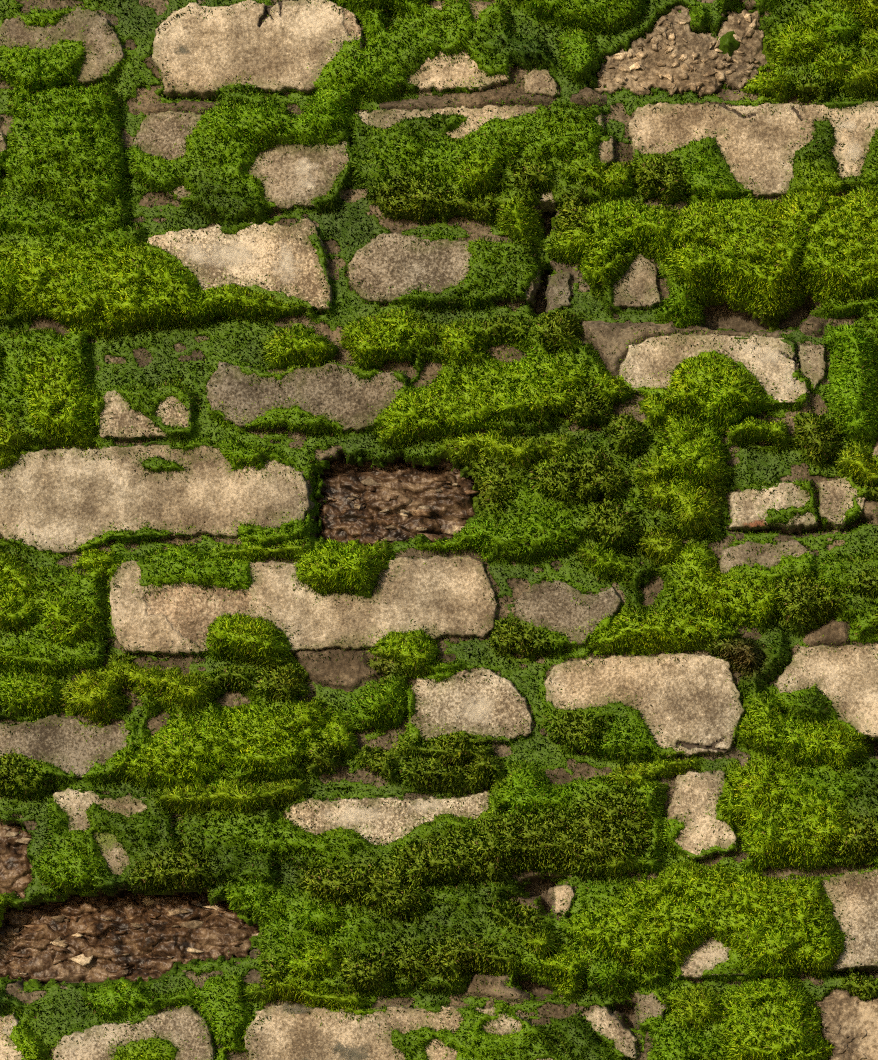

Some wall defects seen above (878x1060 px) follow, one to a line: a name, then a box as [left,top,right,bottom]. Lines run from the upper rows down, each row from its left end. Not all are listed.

crack [258,1,282,27]